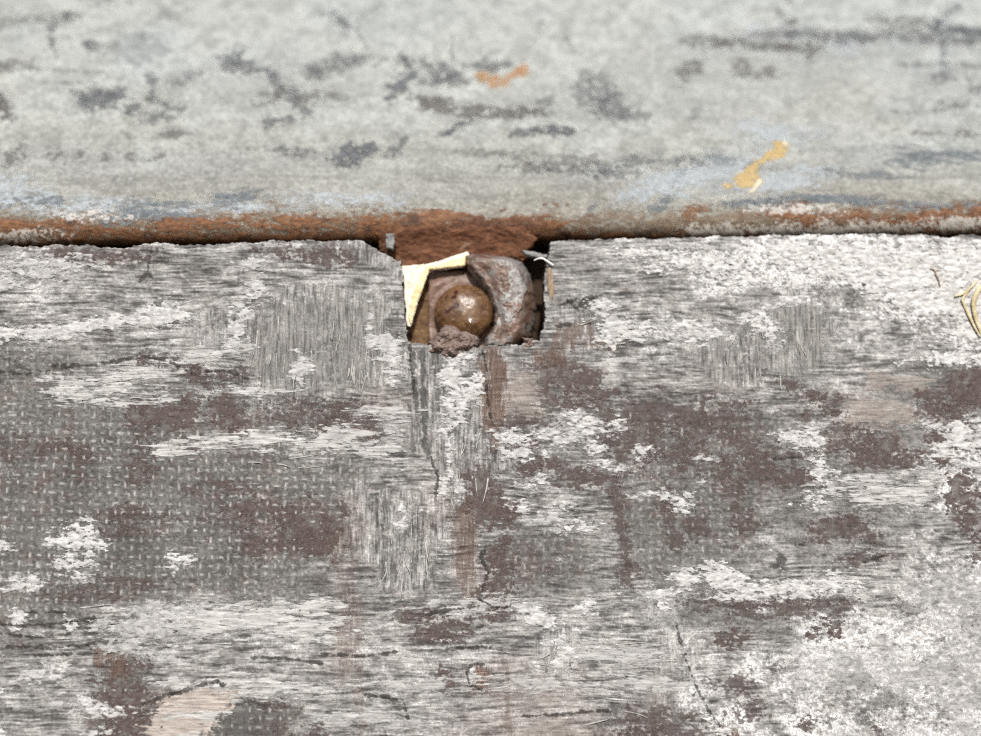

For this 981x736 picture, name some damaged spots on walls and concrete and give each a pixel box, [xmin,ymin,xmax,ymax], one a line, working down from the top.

rust [471,63,530,89]
rust [0,200,981,247]
rust [502,267,527,323]